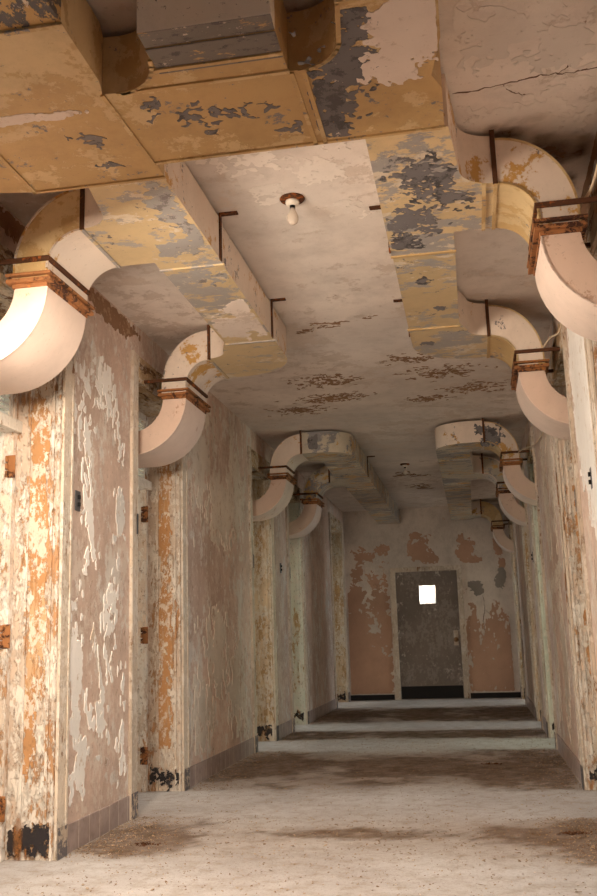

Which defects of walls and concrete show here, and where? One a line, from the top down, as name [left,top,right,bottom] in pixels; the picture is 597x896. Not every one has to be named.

peeling [140,96,161,124]
peeling [175,100,280,135]
peeling [195,0,438,206]
crack [453,65,597,95]
peeling [378,150,476,250]
peeling [264,373,377,417]
peeling [567,328,597,578]
peeling [22,386,52,789]
peeling [68,340,127,807]
peeling [158,464,173,749]
peeling [348,544,395,694]
rust [14,818,26,859]